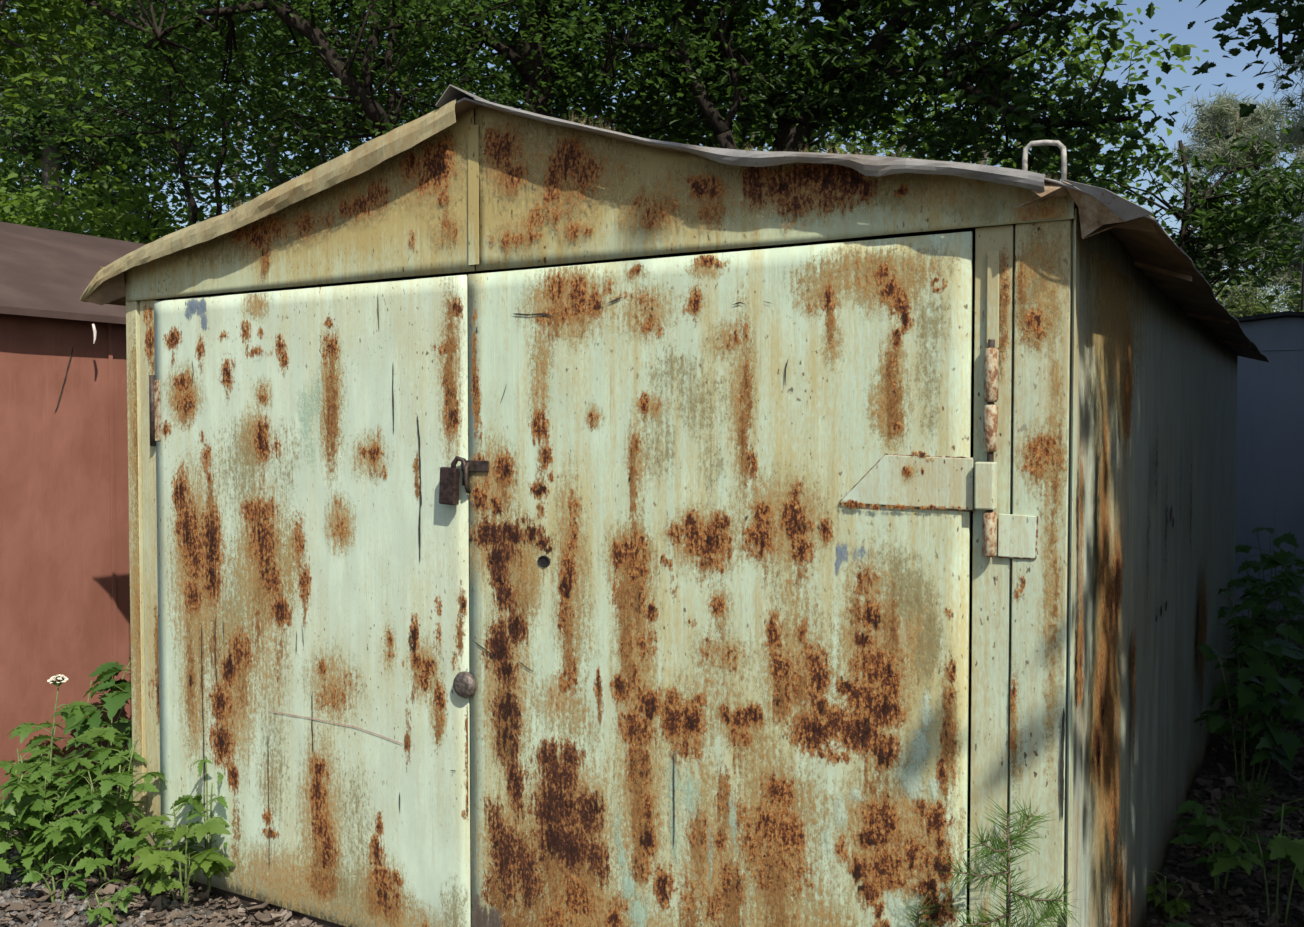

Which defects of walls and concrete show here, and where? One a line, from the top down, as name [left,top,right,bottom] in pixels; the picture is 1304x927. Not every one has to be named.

rust [216,115,615,399]
rust [615,152,926,237]
rust [127,305,441,927]
rust [384,580,467,769]
rust [434,246,968,927]
rust [999,223,1146,927]